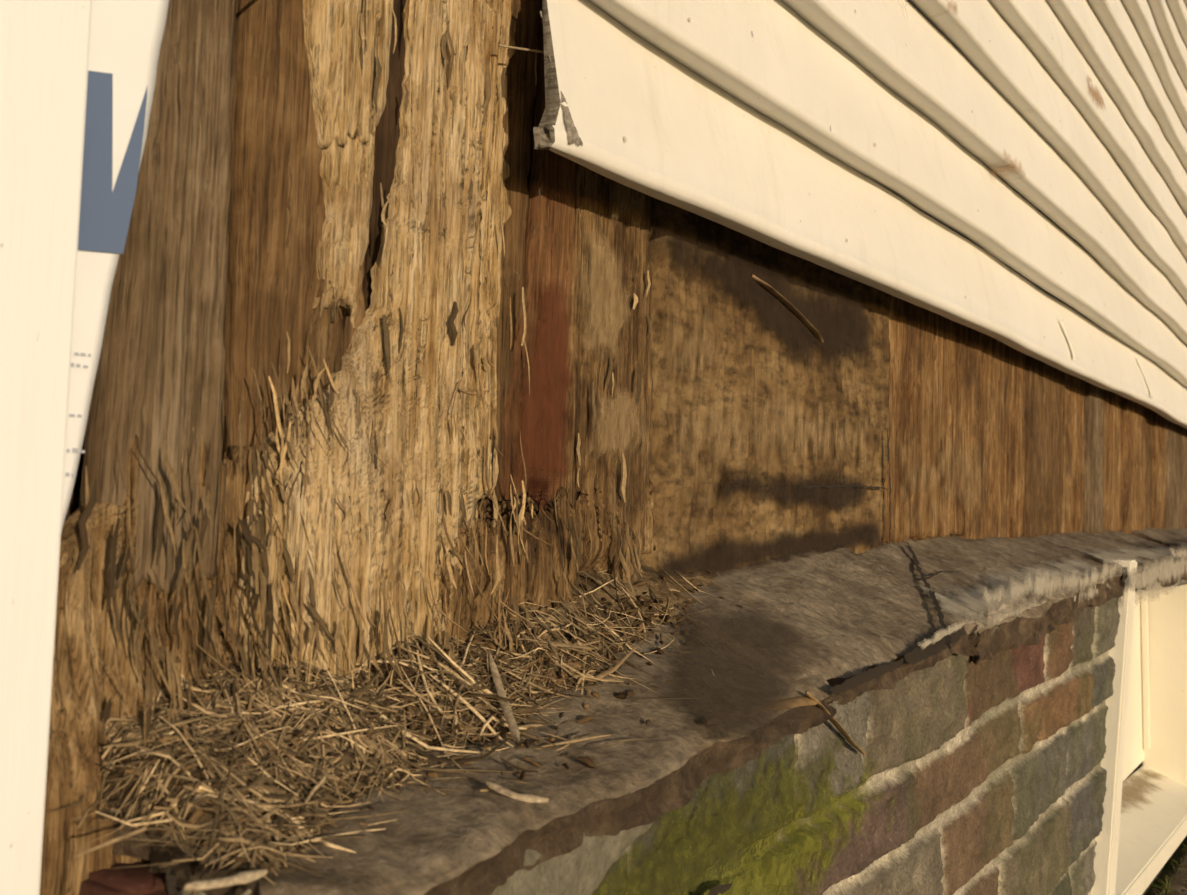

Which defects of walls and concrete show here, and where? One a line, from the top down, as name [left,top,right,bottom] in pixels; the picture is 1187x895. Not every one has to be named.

water stain [662,230,872,362]
water stain [663,523,880,576]
water stain [723,470,866,510]
crack [798,430,961,650]
water stain [669,610,810,742]